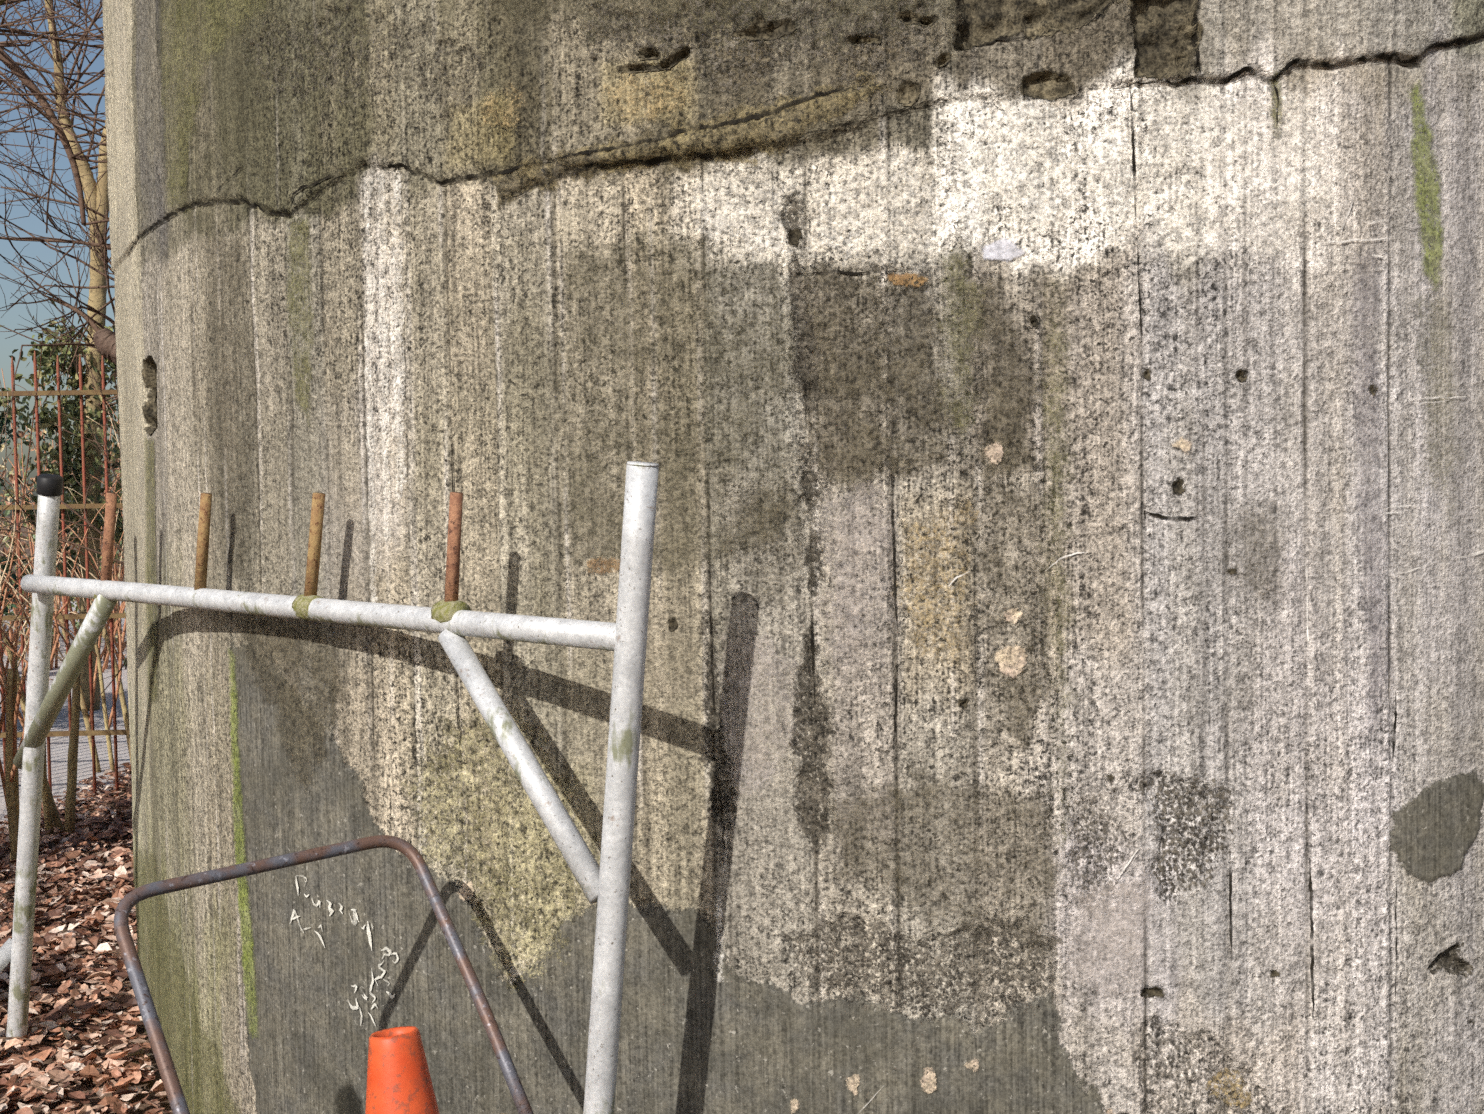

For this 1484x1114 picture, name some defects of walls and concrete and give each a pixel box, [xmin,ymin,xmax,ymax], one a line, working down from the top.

crack [964,35,1034,50]
crack [1089,0,1117,23]
crack [127,82,869,258]
crack [1113,0,1484,341]
spalling [141,355,158,436]
leakage [290,875,399,1026]
peeling [229,640,600,1114]
peeling [614,900,1113,1114]
leakage [335,1084,361,1114]